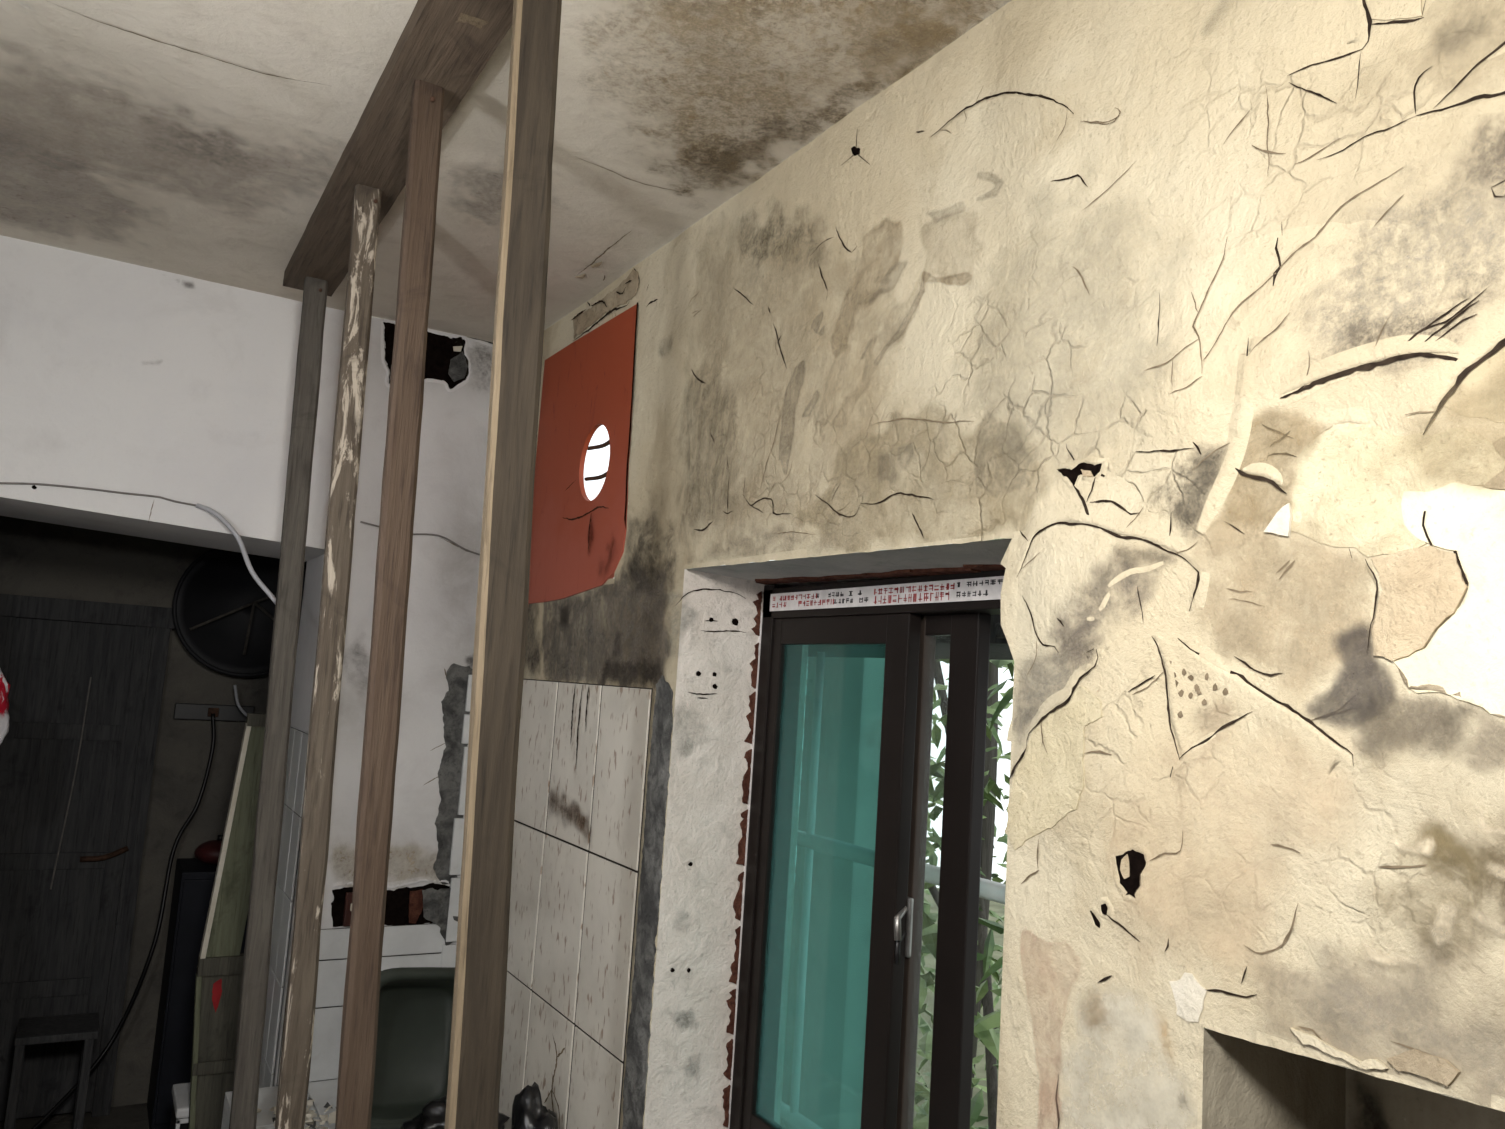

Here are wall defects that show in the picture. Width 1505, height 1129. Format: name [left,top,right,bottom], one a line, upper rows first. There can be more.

leakage [639,0,981,182]
crack [1136,0,1505,494]
crack [694,417,932,538]
crack [1000,445,1354,781]
flaking render [1170,661,1228,718]
leakage [1220,562,1459,749]
crack [1349,549,1378,649]
flaking render [1264,345,1505,718]
flaking render [331,879,353,927]
peeling [384,663,473,946]
crack [1207,904,1298,998]
leakage [1422,833,1505,905]